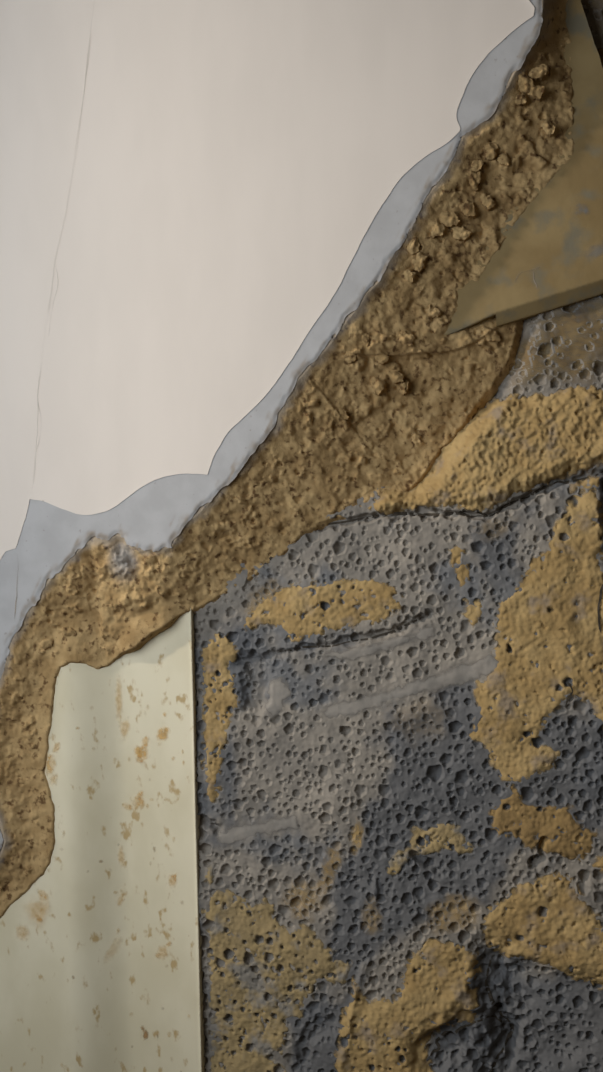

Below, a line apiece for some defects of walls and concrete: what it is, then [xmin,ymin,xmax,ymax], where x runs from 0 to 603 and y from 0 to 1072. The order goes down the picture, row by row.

peeling [457,0,545,133]
flaking render [528,64,548,82]
flaking render [540,120,555,137]
flaking render [468,160,484,173]
flaking render [482,143,498,161]
flaking render [497,152,510,166]
flaking render [469,171,482,192]
flaking render [452,226,472,242]
peeling [0,129,467,679]
crack [327,471,603,526]
crack [595,584,603,632]
crack [277,616,428,653]